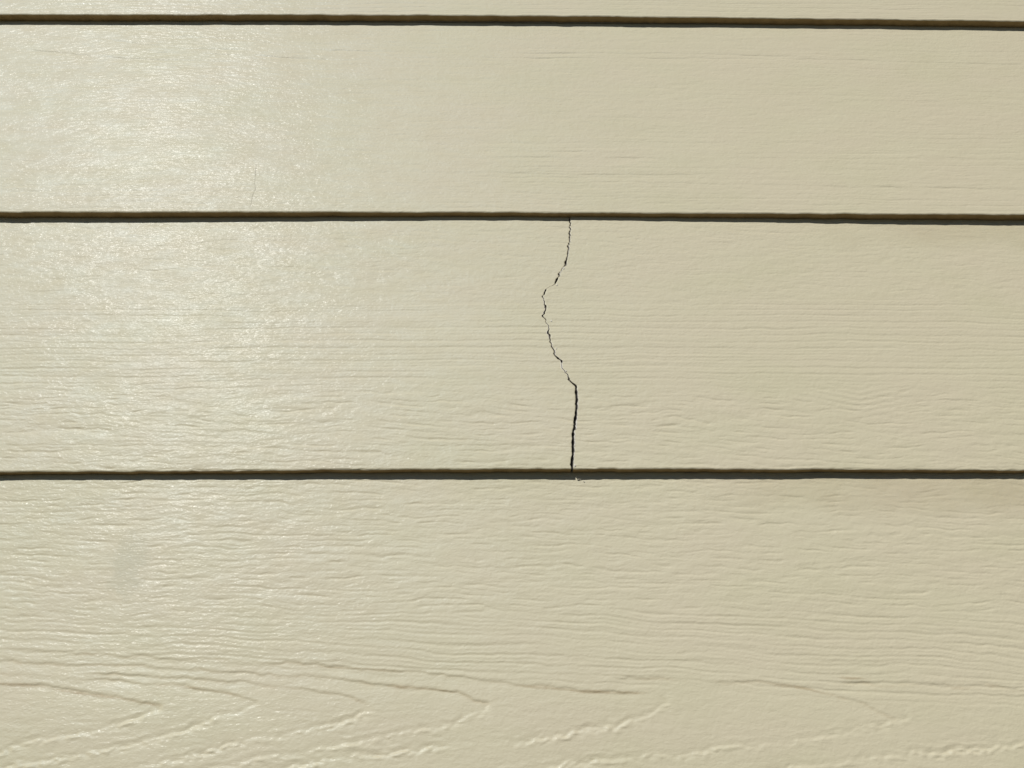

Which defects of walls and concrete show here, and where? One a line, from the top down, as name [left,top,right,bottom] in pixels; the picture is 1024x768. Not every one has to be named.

crack [541,218,585,482]